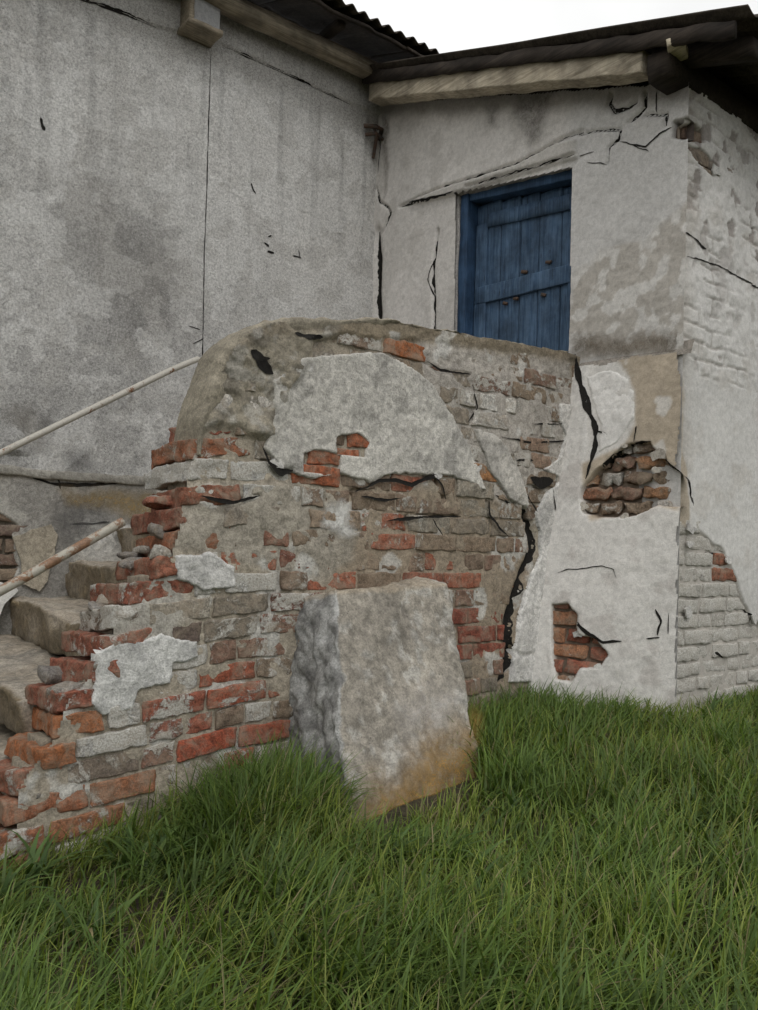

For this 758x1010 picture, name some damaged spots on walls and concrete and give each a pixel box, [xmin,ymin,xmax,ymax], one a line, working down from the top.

crack [81,0,156,28]
crack [189,45,344,355]
crack [377,92,671,329]
crack [686,232,758,288]
peeling [0,514,58,591]
peeling [264,352,572,683]
crack [427,361,478,422]
crack [504,423,564,443]
flaking render [553,604,608,680]
flaking render [580,370,673,519]
crack [574,354,694,505]
flaking render [646,520,758,717]